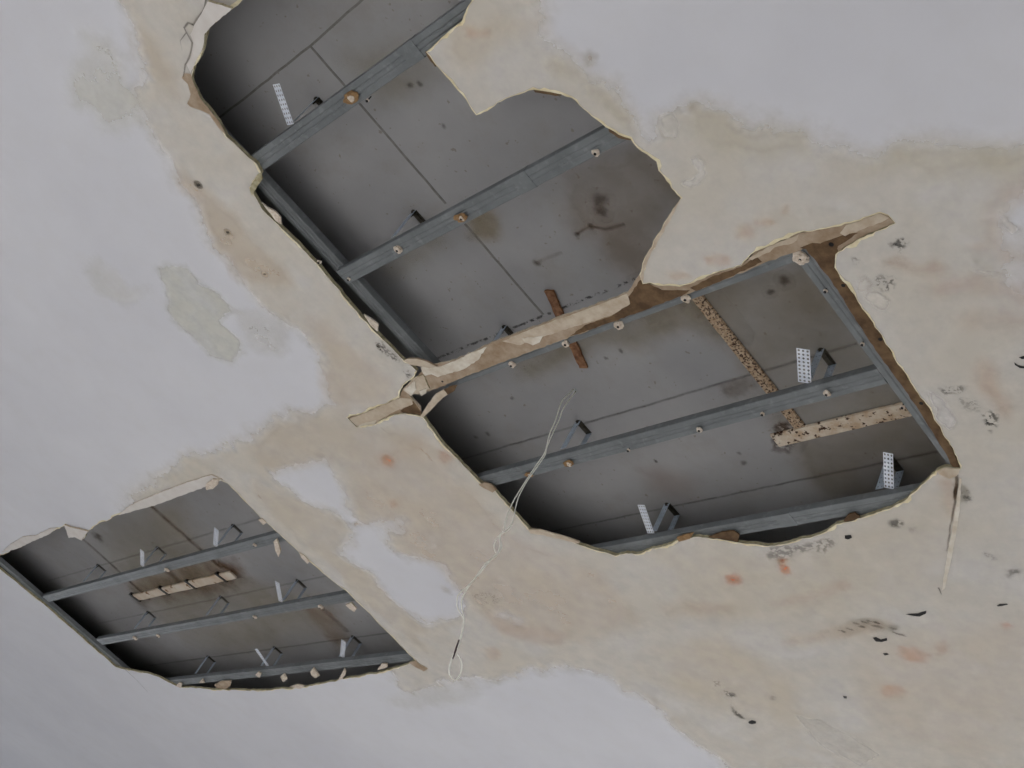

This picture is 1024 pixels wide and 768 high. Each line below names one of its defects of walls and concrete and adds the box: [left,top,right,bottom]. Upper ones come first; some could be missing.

water stain [435,0,541,114]
flaking render [182,73,225,133]
peeling [250,172,282,225]
water stain [122,0,412,407]
water stain [820,233,857,249]
water stain [691,258,762,291]
peeling [503,294,630,345]
water stain [571,280,690,336]
peeling [421,347,486,377]
water stain [401,401,421,415]
peeling [528,529,580,544]
peeling [709,530,740,542]